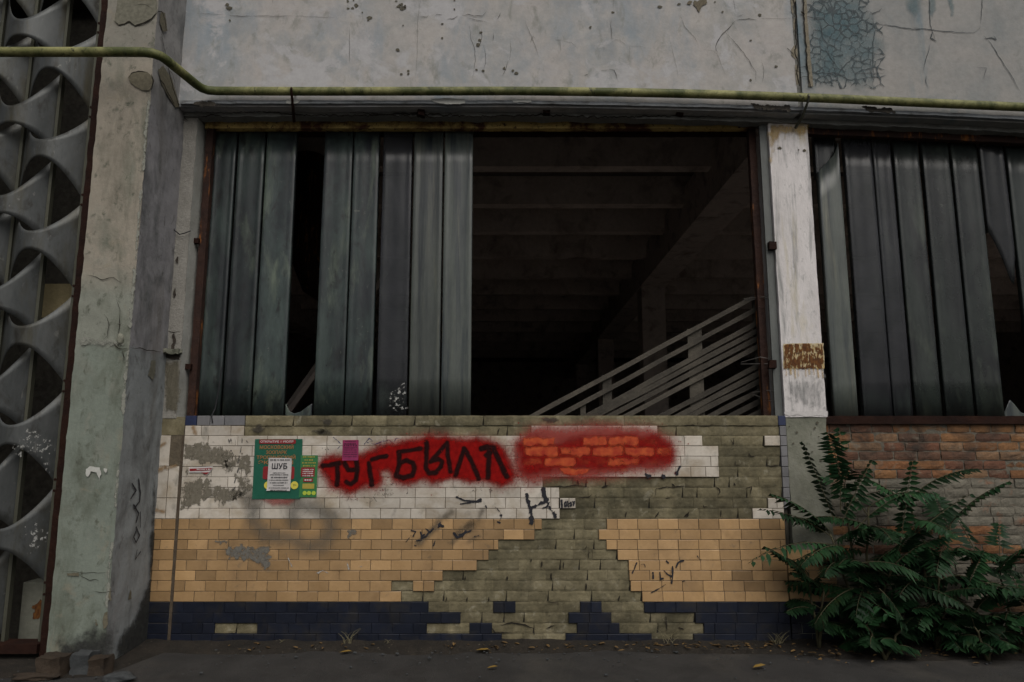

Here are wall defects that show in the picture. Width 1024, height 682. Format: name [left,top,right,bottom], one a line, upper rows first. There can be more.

crack [671,0,1019,89]
spalling [128,11,180,171]
rust [783,343,824,377]
peeling [86,462,119,507]
peeling [162,417,252,510]
peeling [215,540,272,570]
peeling [245,383,828,640]